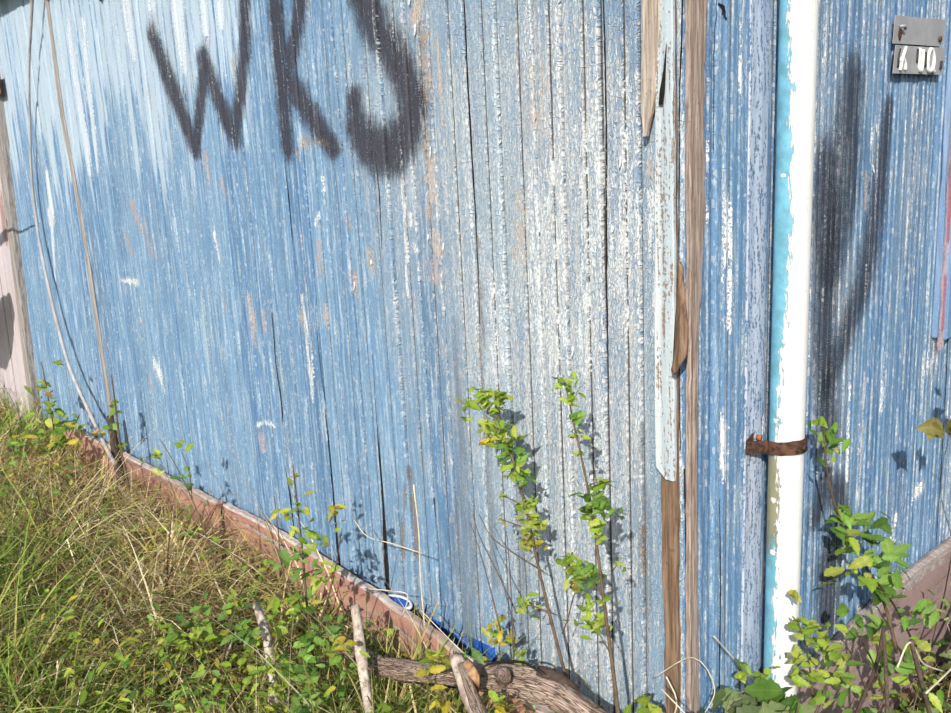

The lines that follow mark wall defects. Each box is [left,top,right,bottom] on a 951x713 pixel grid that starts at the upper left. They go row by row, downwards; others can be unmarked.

peeling [477,266,510,392]
peeling [511,53,655,386]
peeling [721,189,737,334]
peeling [762,0,819,443]
crack [372,355,390,592]
peeling [718,412,729,484]
peeling [845,370,866,508]
peeling [911,478,925,502]
peeling [770,453,804,698]